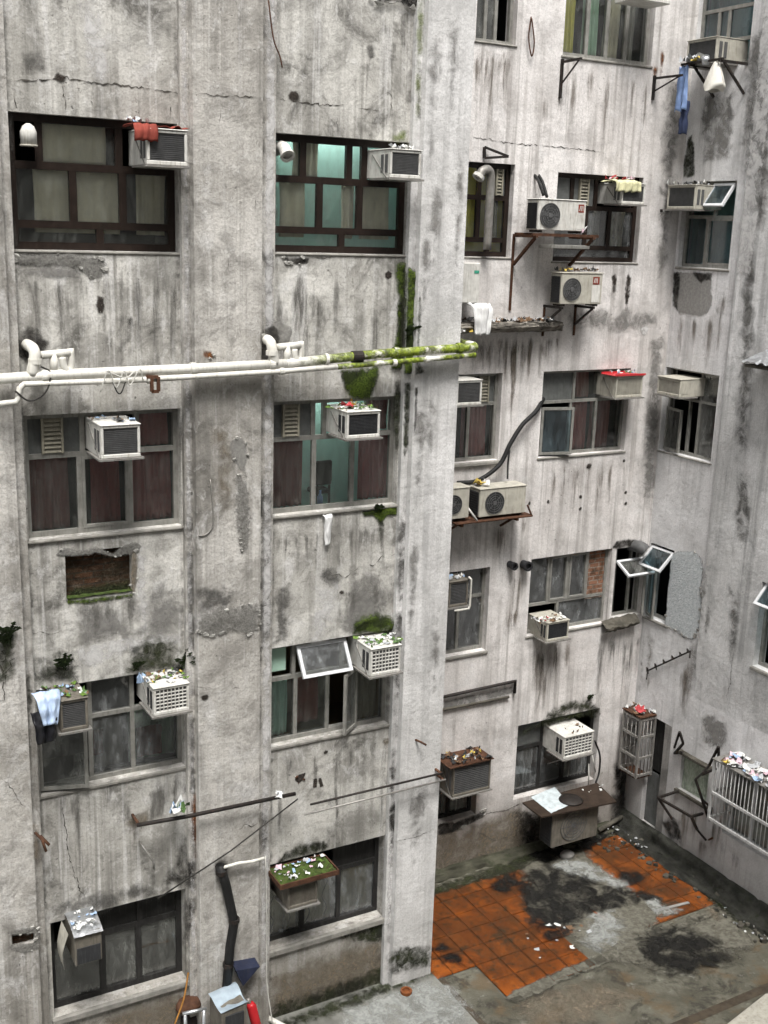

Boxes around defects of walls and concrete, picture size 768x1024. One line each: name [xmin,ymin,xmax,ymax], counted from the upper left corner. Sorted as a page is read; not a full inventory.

crack [11,76,178,115]
water stain [663,84,733,177]
water stain [659,190,669,267]
flaking render [14,253,109,279]
flaking render [56,543,141,594]
water stain [554,861,626,886]